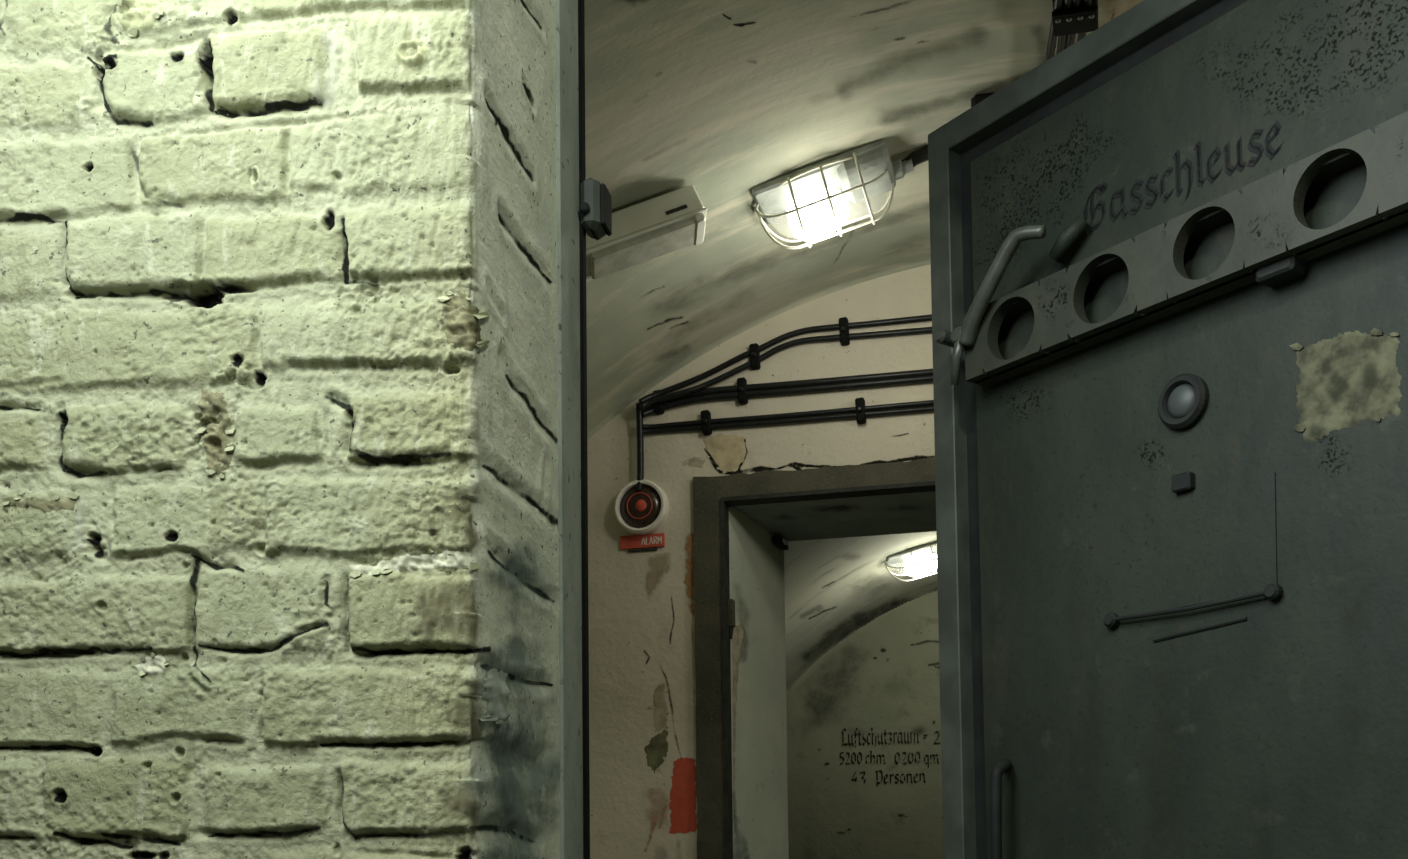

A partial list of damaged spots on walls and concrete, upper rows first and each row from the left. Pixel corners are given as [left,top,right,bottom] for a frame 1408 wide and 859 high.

spalling [436,290,490,351]
flaking render [683,433,840,474]
spalling [860,455,935,465]
flaking render [644,683,670,774]